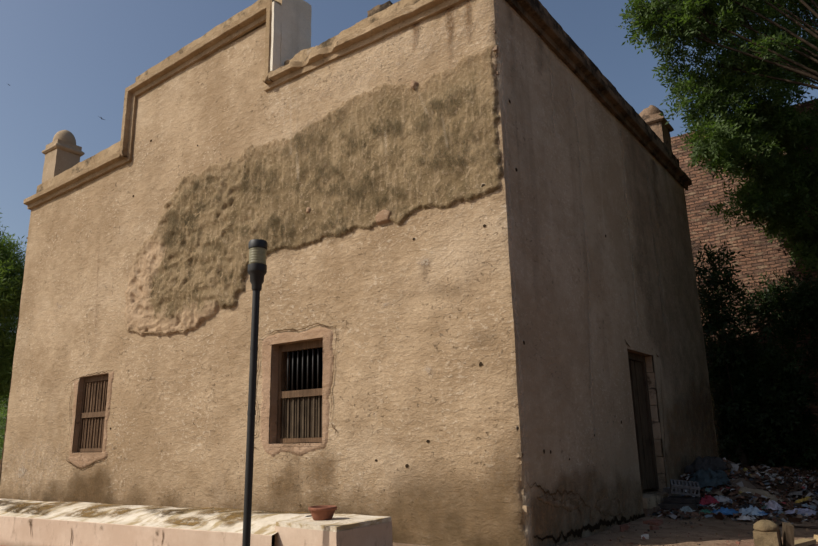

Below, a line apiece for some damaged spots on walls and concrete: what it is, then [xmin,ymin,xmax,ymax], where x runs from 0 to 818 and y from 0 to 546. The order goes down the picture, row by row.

crack [257,323,337,433]
leakage [73,481,99,503]
crack [528,482,645,543]